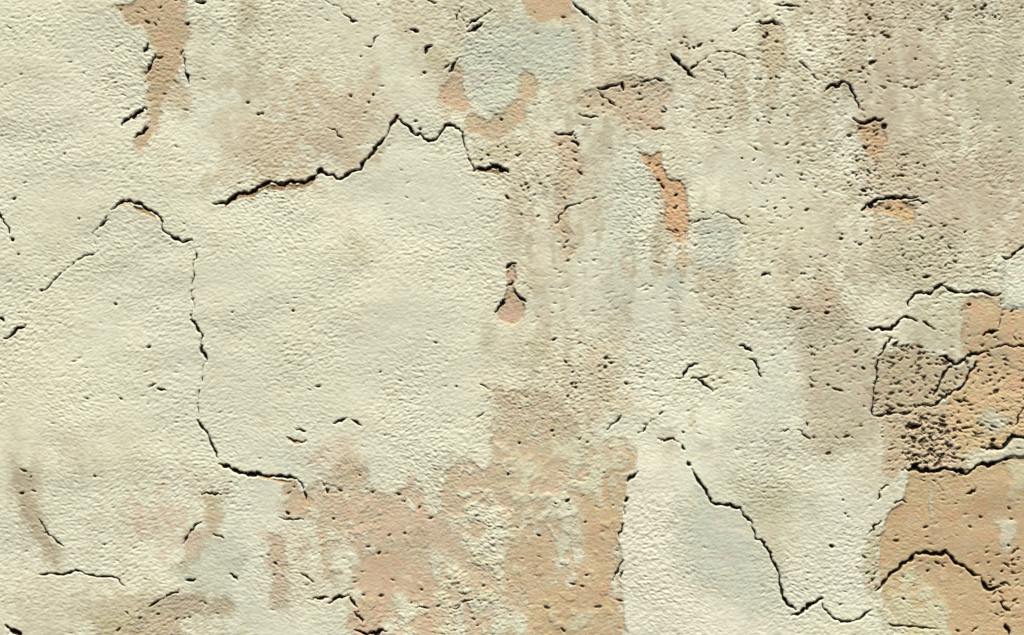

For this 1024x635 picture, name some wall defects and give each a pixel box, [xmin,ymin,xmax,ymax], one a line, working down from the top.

flaking render [110,0,192,155]
crack [214,115,509,207]
flaking render [522,0,584,29]
crack [41,569,121,583]
crack [43,200,329,521]
flaking render [263,360,639,635]
flaking render [493,264,526,326]
crack [607,412,1010,635]
flaking render [862,290,1024,635]
crack [869,284,1024,532]